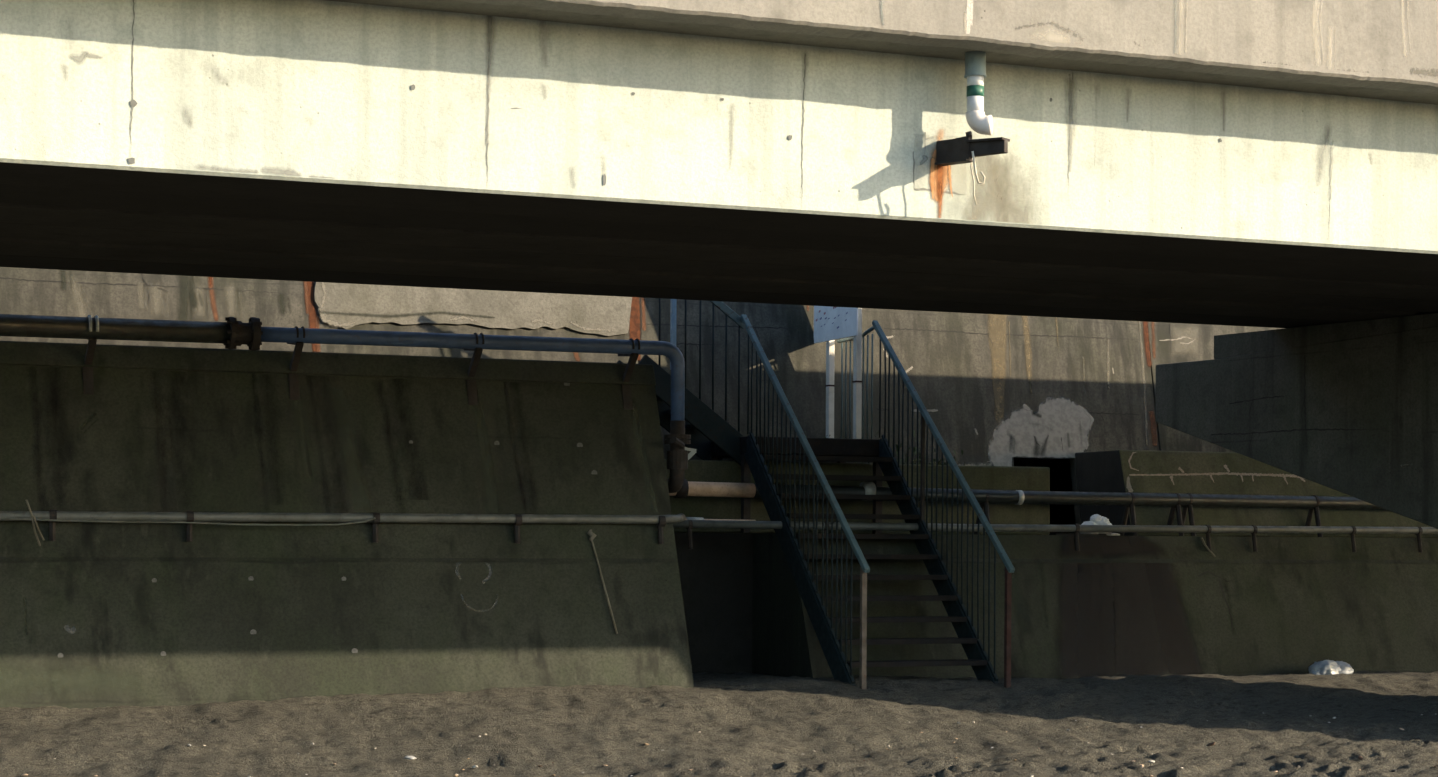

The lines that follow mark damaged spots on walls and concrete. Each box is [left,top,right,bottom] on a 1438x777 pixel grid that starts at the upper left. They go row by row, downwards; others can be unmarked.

rust [930,132,953,218]
rust [304,281,320,352]